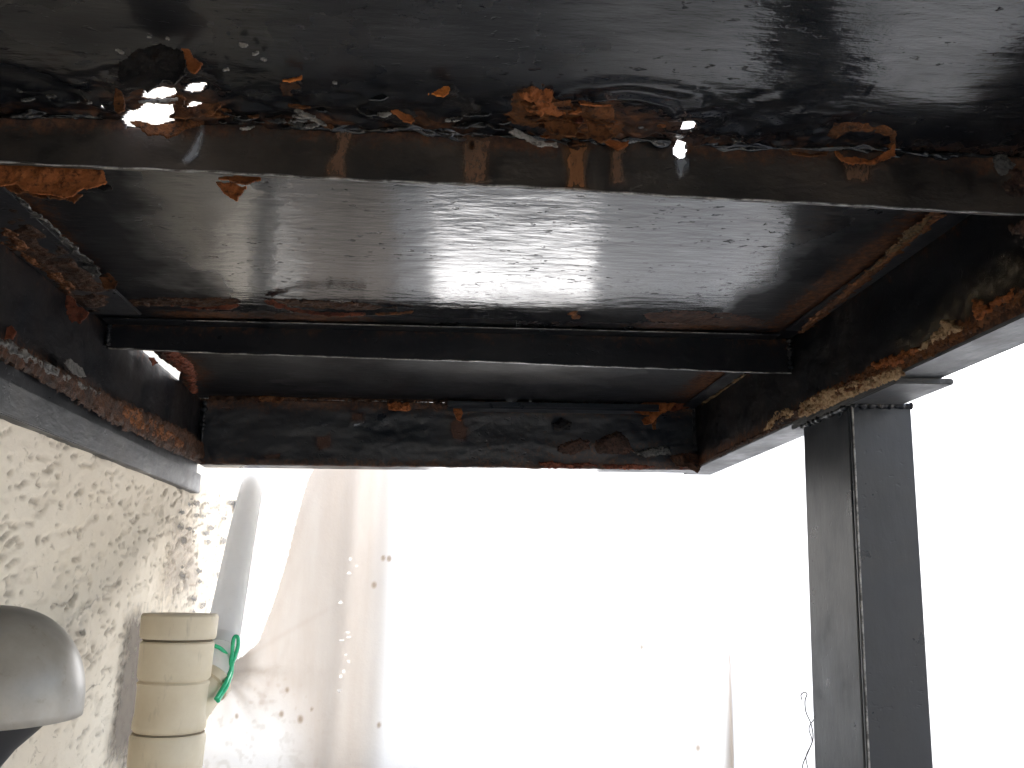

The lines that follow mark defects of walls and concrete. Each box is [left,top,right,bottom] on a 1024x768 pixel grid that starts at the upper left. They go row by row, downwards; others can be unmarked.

peeling [113,35,203,114]
corrosion [0,165,113,204]
corrosion [216,176,261,201]
corrosion [504,84,629,188]
corrosion [789,122,897,182]
corrosion [0,209,118,324]
corrosion [0,325,205,461]
corrosion [669,262,1024,473]
corrosion [538,461,655,470]